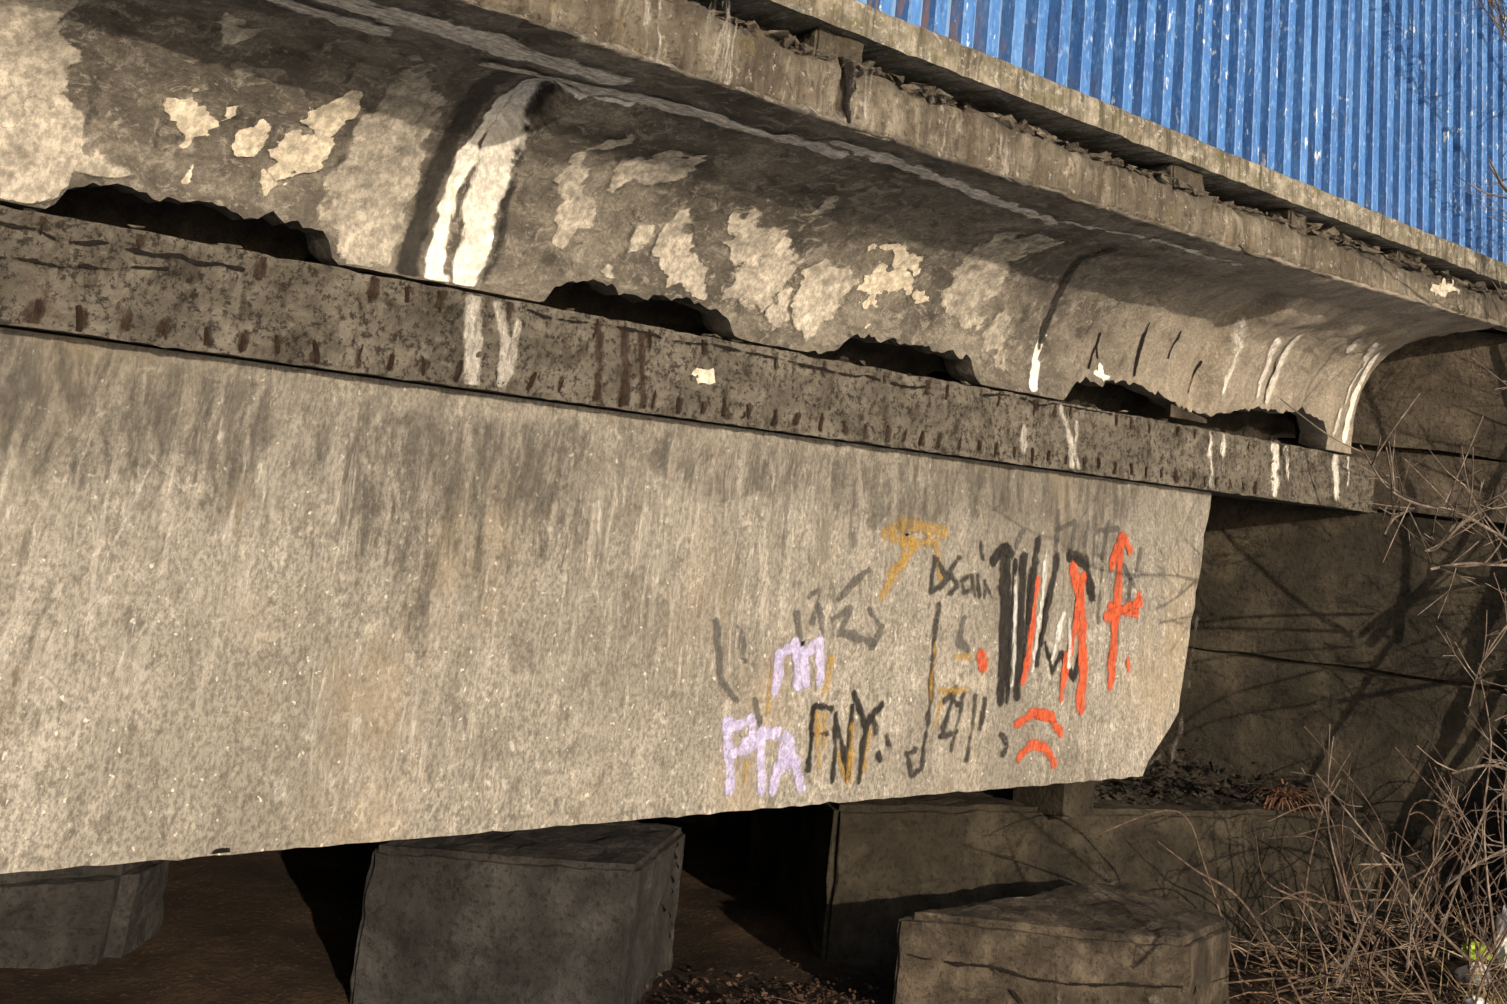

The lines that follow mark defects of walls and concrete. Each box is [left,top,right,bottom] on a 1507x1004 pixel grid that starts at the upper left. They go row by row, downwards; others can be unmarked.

peeling [0,0,311,261]
peeling [163,55,455,267]
damp [267,0,1243,392]
crack [0,221,246,272]
corrosion [504,302,514,322]
crack [527,308,930,389]
peeling [491,206,1064,386]
crack [1134,322,1203,393]
damp [1256,334,1303,404]
corrosion [702,402,753,420]
corrosion [886,426,1118,475]
damp [1331,338,1382,500]